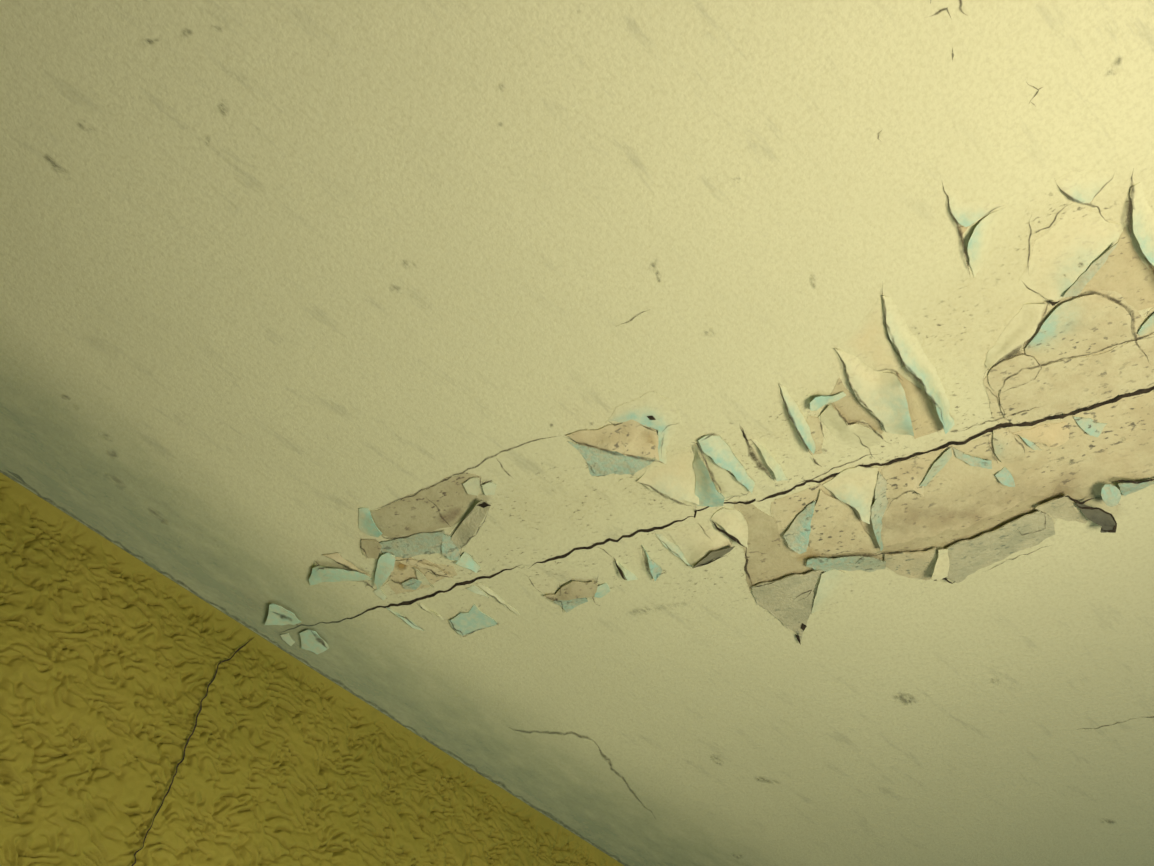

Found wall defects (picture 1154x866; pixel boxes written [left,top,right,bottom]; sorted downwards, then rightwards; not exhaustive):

flaking render [565,168,1154,645]
peeling [265,604,329,654]
peeling [309,424,553,636]
peeling [530,578,610,613]
crack [2,386,1154,866]